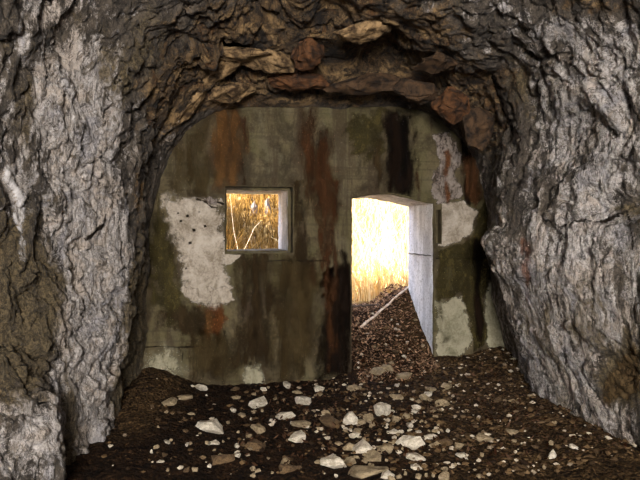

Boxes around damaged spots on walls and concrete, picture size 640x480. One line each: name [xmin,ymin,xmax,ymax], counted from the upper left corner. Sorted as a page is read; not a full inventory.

water stain [346,107,420,197]
flaking render [431,130,478,246]
flaking render [160,193,241,310]
corrosion [300,114,351,380]
corrosion [205,305,227,339]
peeling [434,296,473,357]